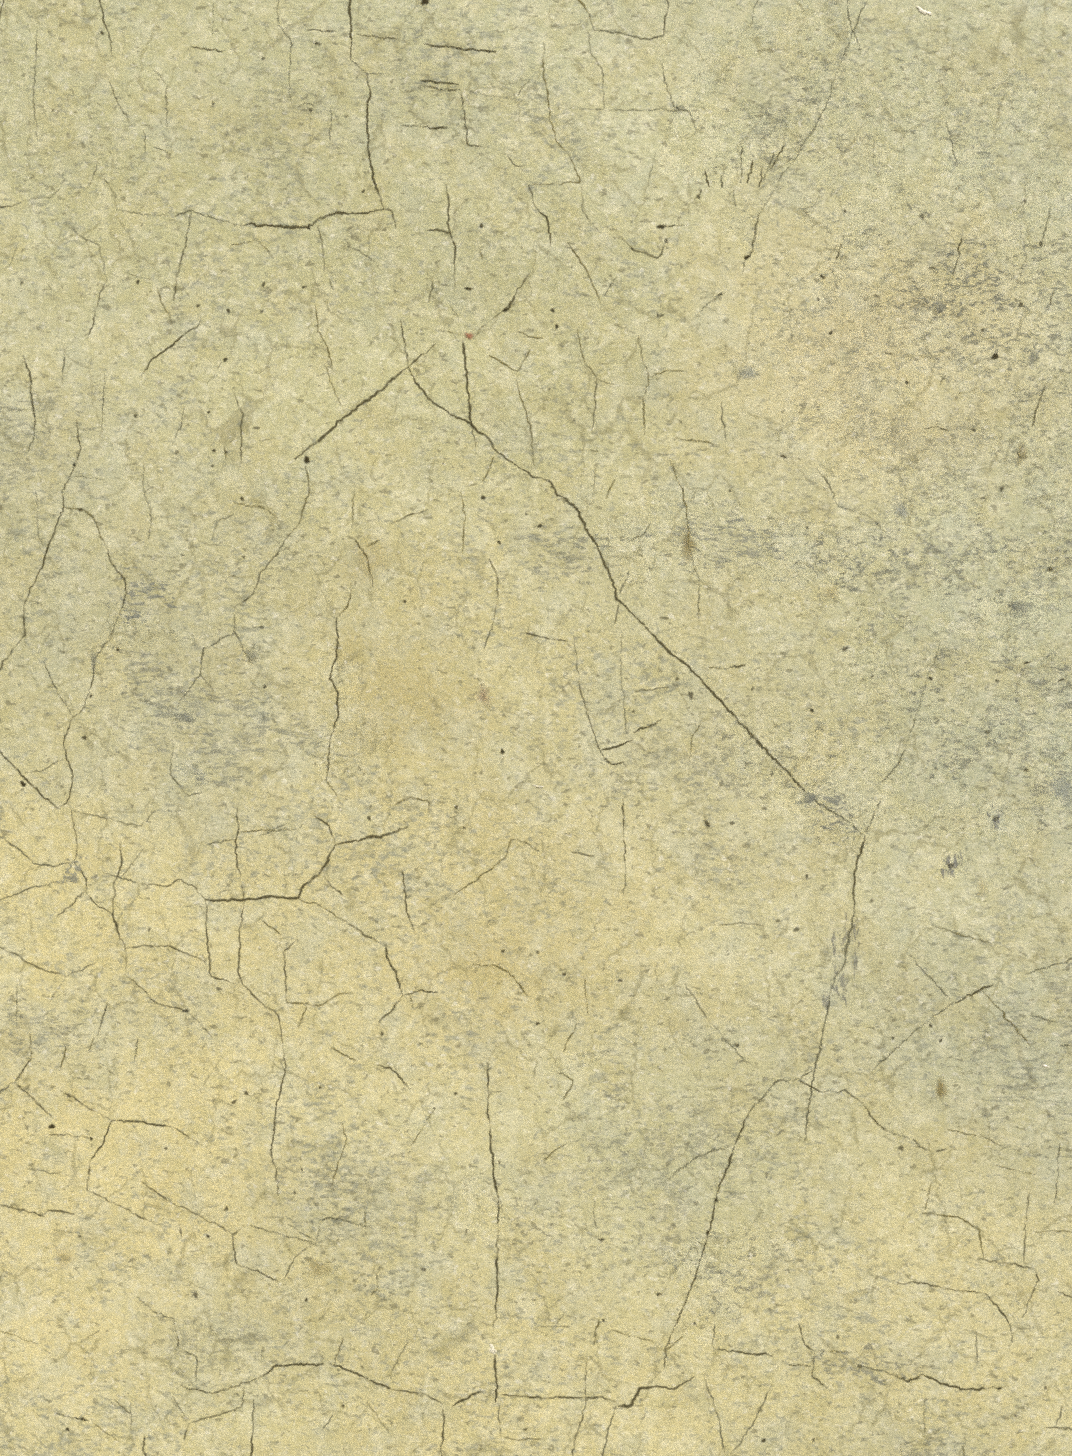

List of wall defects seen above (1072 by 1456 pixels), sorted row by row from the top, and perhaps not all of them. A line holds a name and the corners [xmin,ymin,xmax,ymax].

crack [131,0,598,370]
crack [578,0,692,116]
crack [25,296,100,444]
crack [0,388,127,669]
crack [0,499,437,1194]
crack [152,193,1072,1456]
crack [0,1006,366,1280]
crack [59,1401,147,1456]